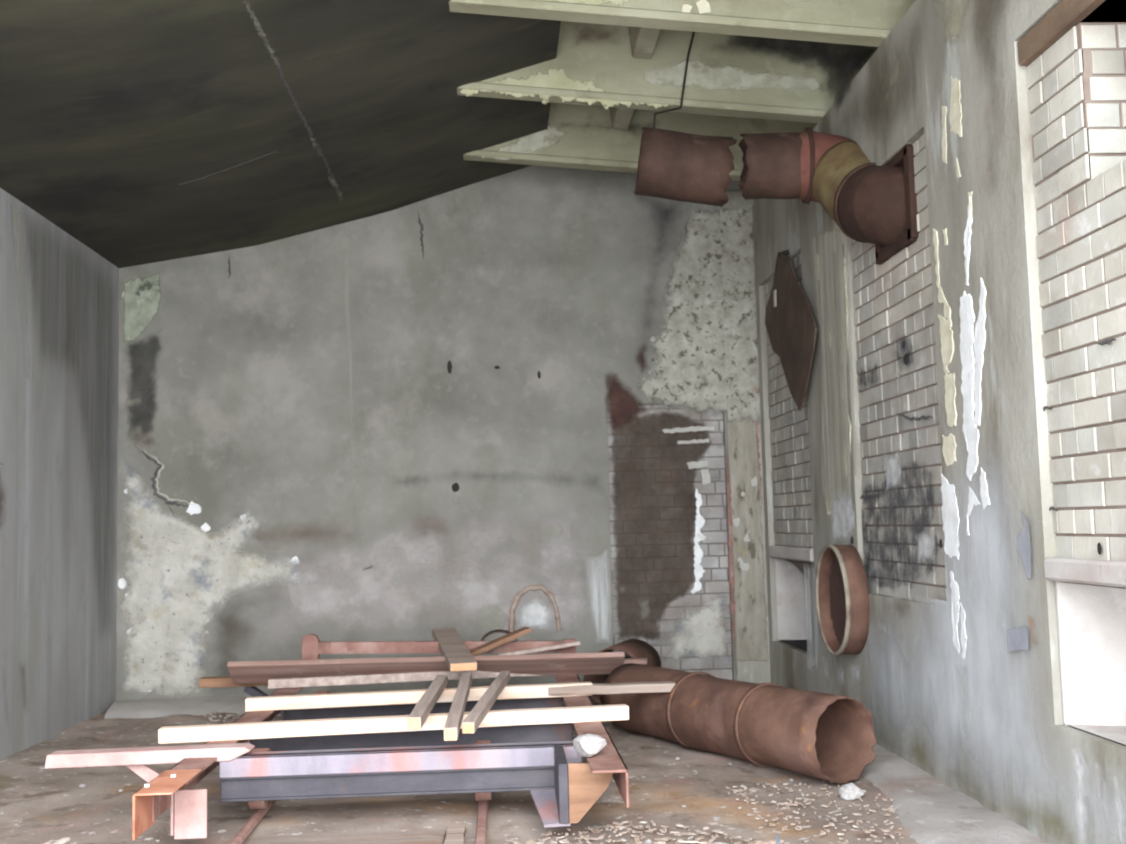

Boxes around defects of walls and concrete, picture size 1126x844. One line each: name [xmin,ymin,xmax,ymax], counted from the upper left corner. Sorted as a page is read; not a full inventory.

peeling [682,0,711,14]
crack [242,0,342,195]
peeling [483,126,564,160]
peeling [460,68,668,109]
water stain [863,47,911,121]
peeling [942,76,962,178]
water stain [129,337,159,442]
crack [135,446,201,518]
flaking render [639,208,768,661]
water stain [804,228,1040,780]
peeling [933,191,990,660]
flaking render [118,463,299,696]